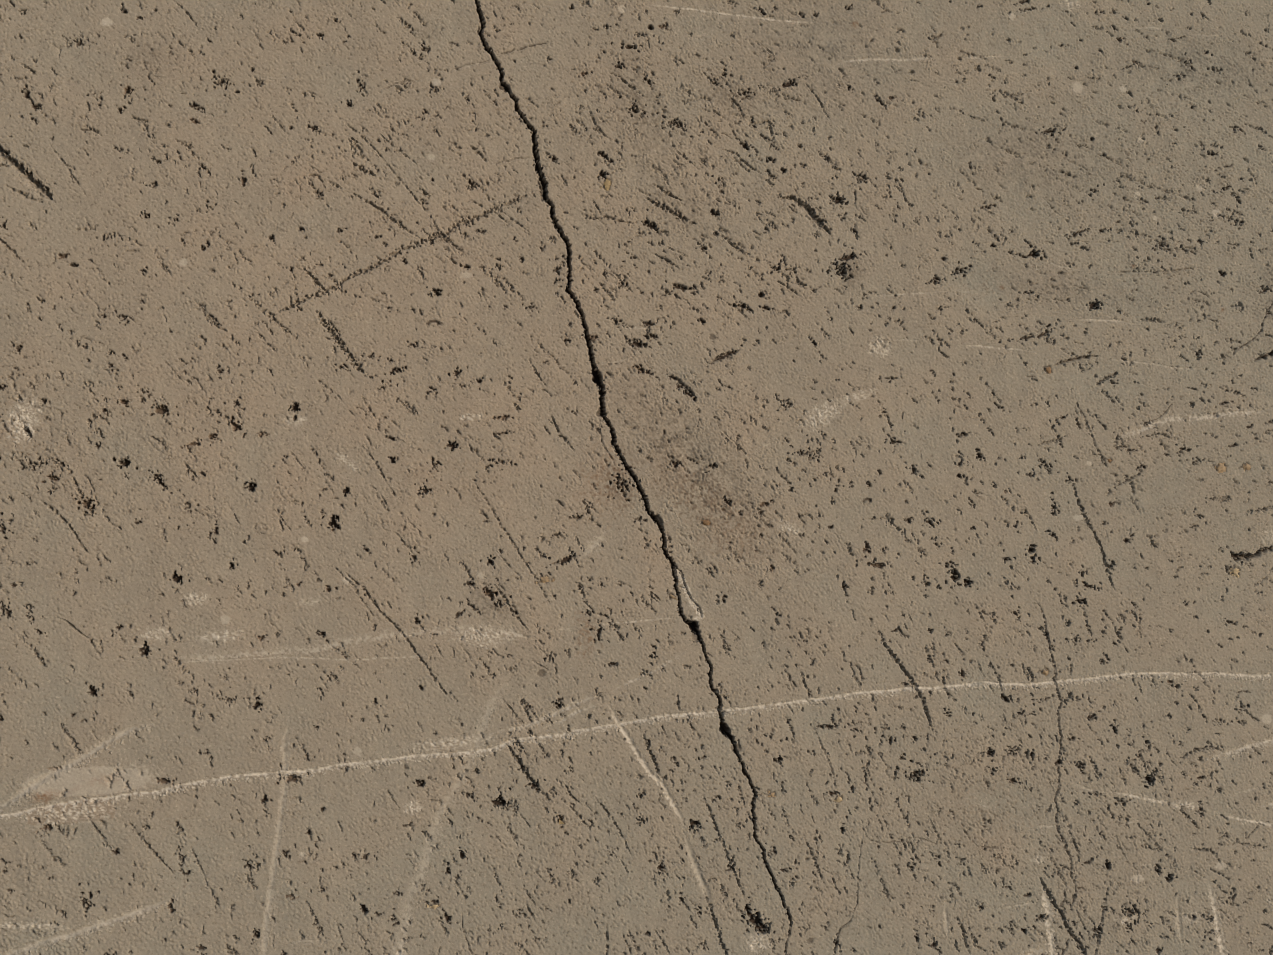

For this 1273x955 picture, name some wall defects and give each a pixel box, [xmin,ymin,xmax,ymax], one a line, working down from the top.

crack [450,0,793,955]
crack [833,826,864,955]